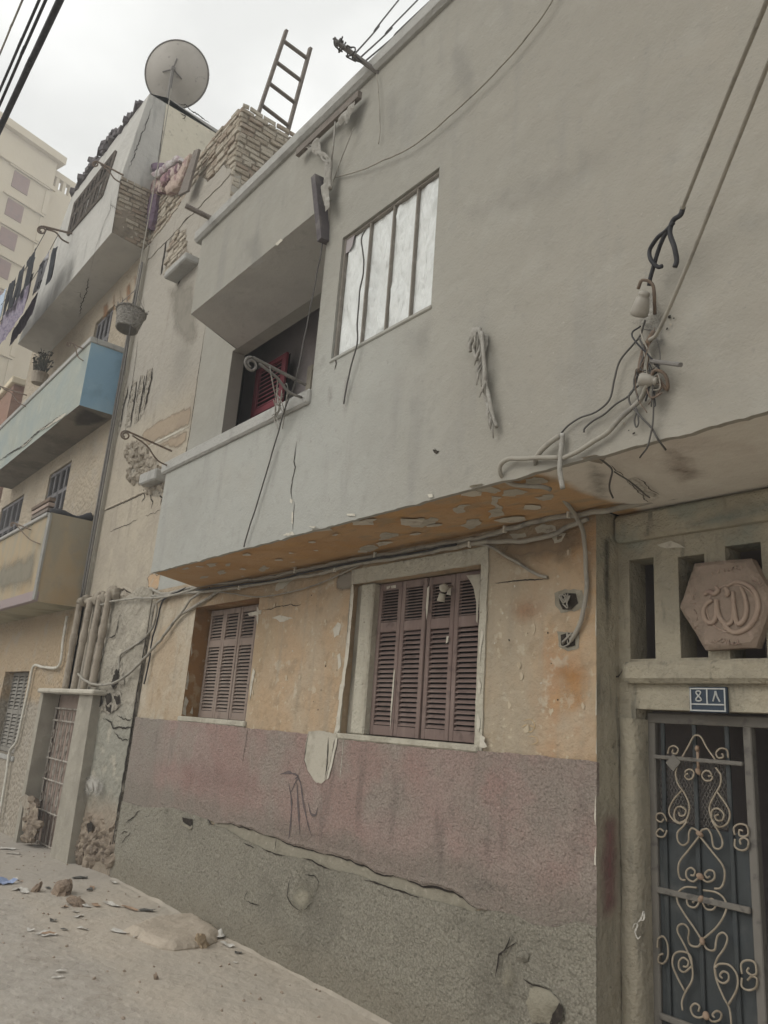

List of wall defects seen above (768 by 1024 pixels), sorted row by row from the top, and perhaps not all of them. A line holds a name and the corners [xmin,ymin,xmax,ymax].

crack [130,108,152,166]
spalling [123,440,166,507]
crack [289,442,297,530]
peeling [347,514,442,553]
peeling [453,477,569,555]
peeling [248,552,296,625]
spalling [99,662,124,714]
peeling [304,567,354,784]
spalling [20,795,44,845]
spalling [74,812,115,869]